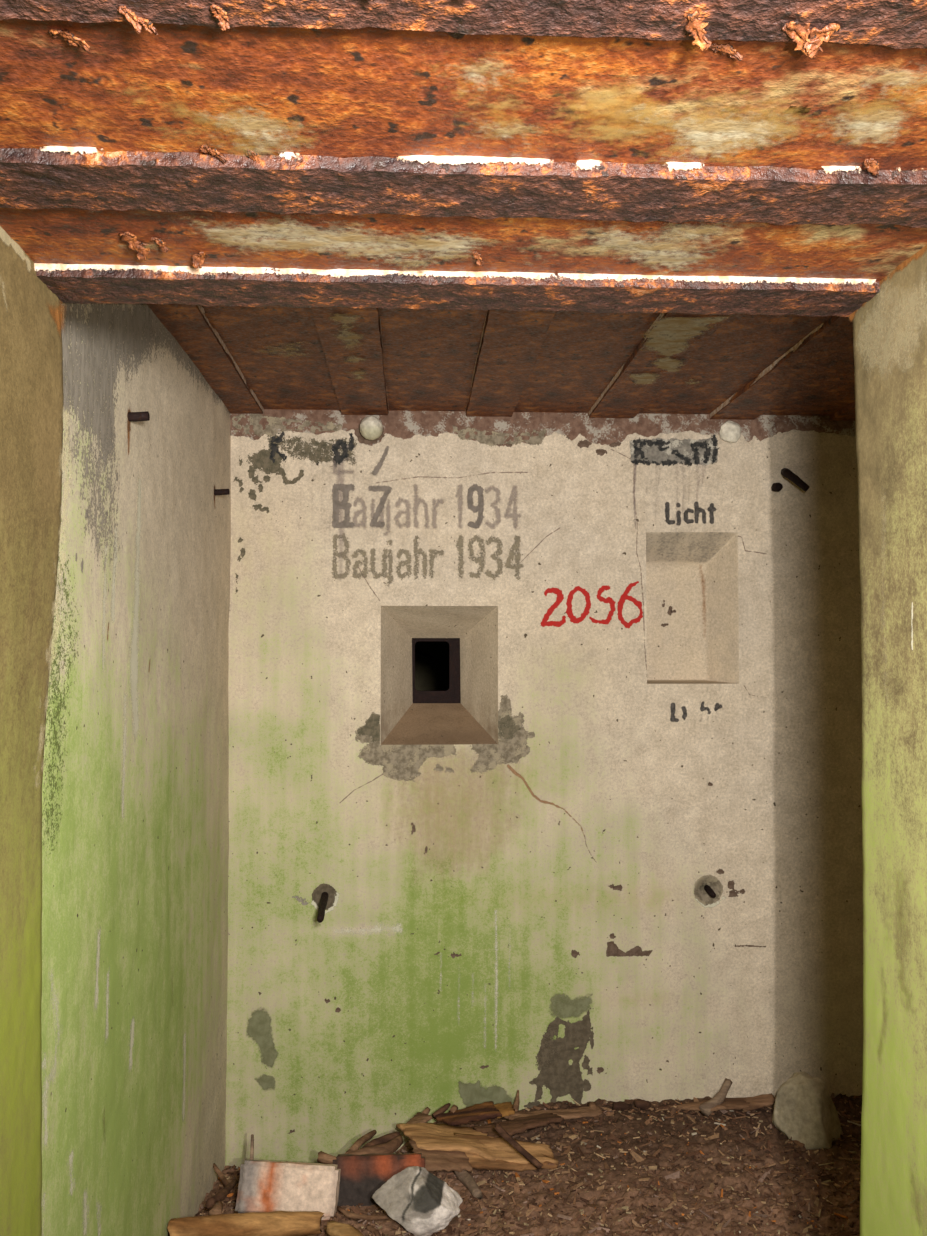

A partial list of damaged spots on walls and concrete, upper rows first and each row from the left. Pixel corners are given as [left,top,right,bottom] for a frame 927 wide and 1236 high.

rust [48,29,90,52]
rust [683,10,743,61]
rust [782,20,841,59]
rust [119,231,169,261]
peeling [230,409,856,456]
spalling [355,694,535,782]
crack [507,765,595,860]
water stain [95,929,109,1038]
water stain [484,910,511,1048]
water stain [42,973,59,1146]
water stain [247,1009,278,1090]
spalling [459,994,594,1108]